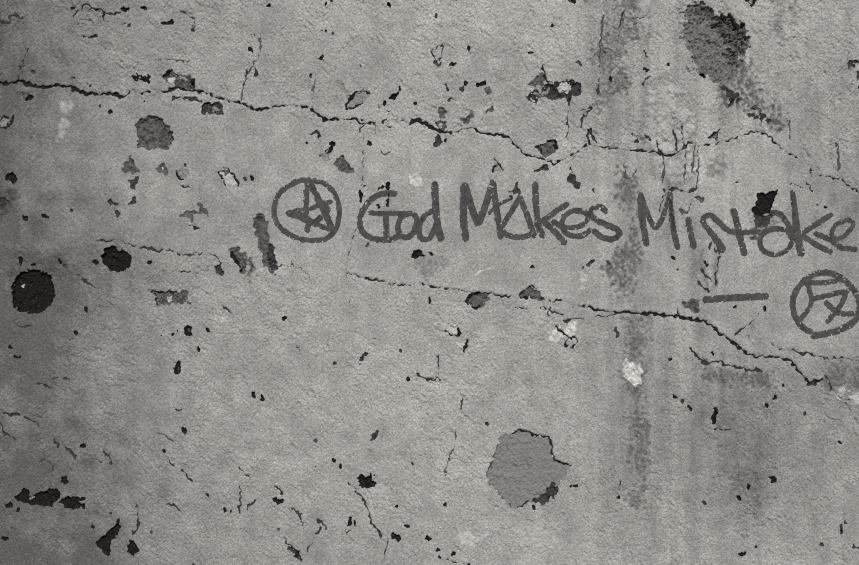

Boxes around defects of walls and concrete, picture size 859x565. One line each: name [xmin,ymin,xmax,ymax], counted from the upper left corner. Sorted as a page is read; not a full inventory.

spalling [526,65,582,105]
spalling [679,1,751,107]
crack [0,12,859,232]
spalling [107,115,174,220]
peeling [155,163,190,188]
spalling [752,189,778,228]
spalling [11,256,56,314]
spalling [92,245,132,273]
spalling [253,213,278,275]
crack [345,229,859,411]
spalling [5,476,86,512]
spalling [486,429,578,510]